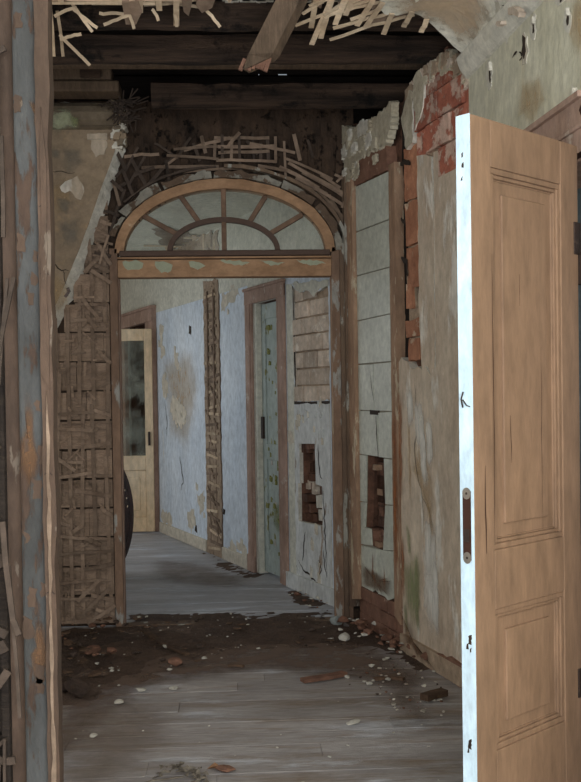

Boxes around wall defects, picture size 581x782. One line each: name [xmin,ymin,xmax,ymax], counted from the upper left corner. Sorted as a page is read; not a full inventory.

flaking render [555,0,572,33]
flaking render [495,6,536,65]
flaking render [60,176,84,200]
flaking render [341,49,469,361]
peeling [123,260,143,270]
peeling [155,261,173,273]
peeling [287,280,333,588]